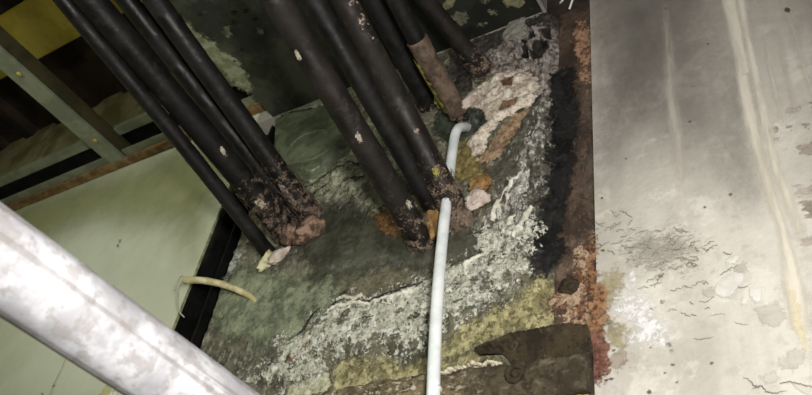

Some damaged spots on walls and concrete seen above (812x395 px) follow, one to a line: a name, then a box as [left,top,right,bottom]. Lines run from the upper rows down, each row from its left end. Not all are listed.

flaking render [467,23,560,164]
water stain [238,268,434,395]
water stain [441,98,555,371]
rust [544,17,630,387]
water stain [599,271,674,349]
flaking render [592,210,718,289]
peeling [649,255,786,327]
peeling [759,348,805,383]